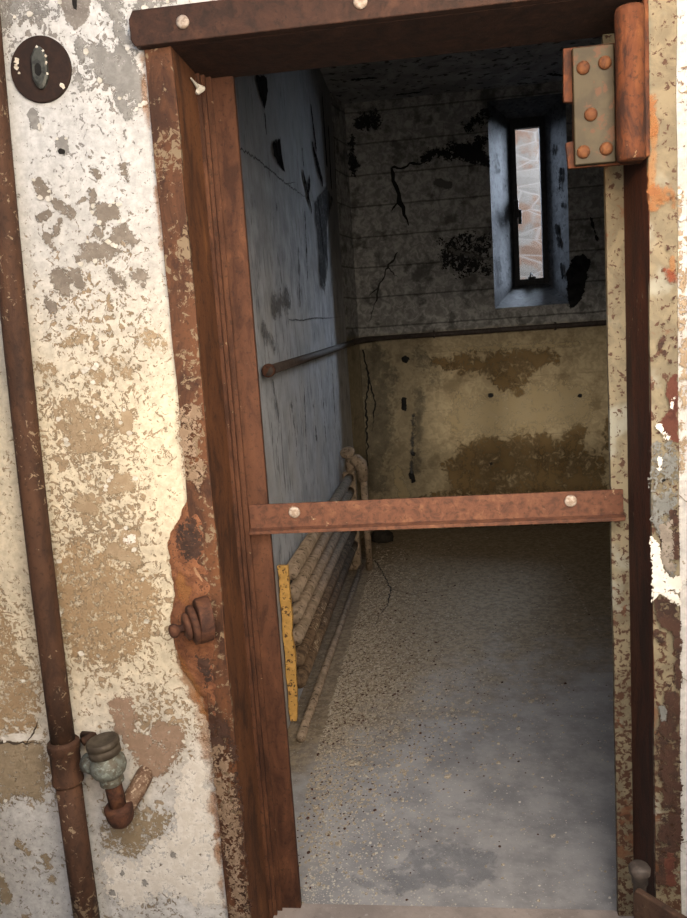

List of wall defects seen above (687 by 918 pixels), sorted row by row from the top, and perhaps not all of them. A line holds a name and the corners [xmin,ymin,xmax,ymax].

peeling [27,108,41,130]
spalling [55,136,69,156]
peeling [31,177,77,252]
peeling [43,165,150,319]
crack [391,161,426,226]
peeling [33,357,58,381]
peeling [58,329,88,349]
peeling [82,354,136,386]
peeling [137,326,168,354]
crack [362,350,376,467]
peeling [648,184,687,891]
peeling [0,588,47,806]